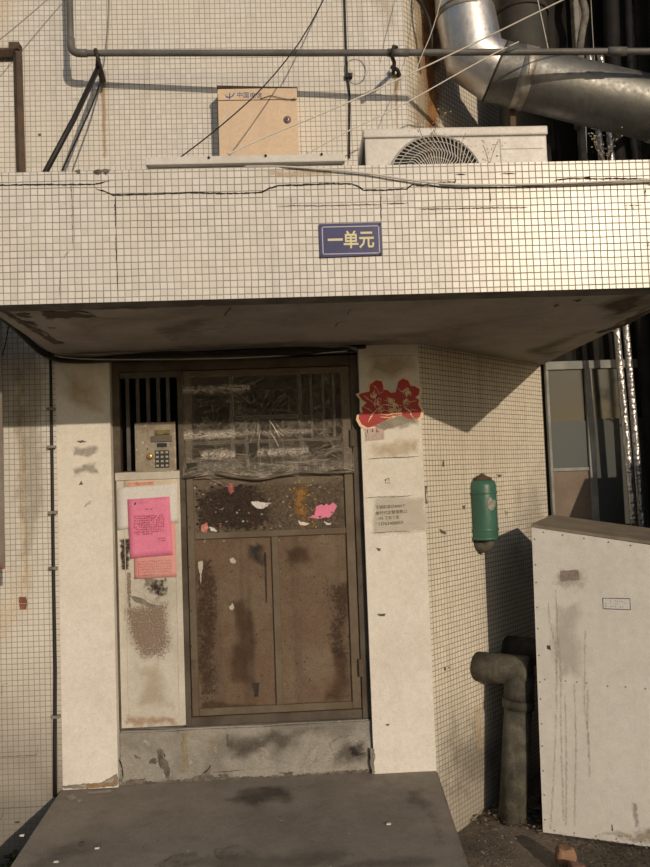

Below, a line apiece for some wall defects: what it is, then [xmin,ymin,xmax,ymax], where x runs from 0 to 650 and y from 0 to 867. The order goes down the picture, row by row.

corrosion [413,0,439,128]
crack [0,173,650,293]
spalling [62,735,376,789]